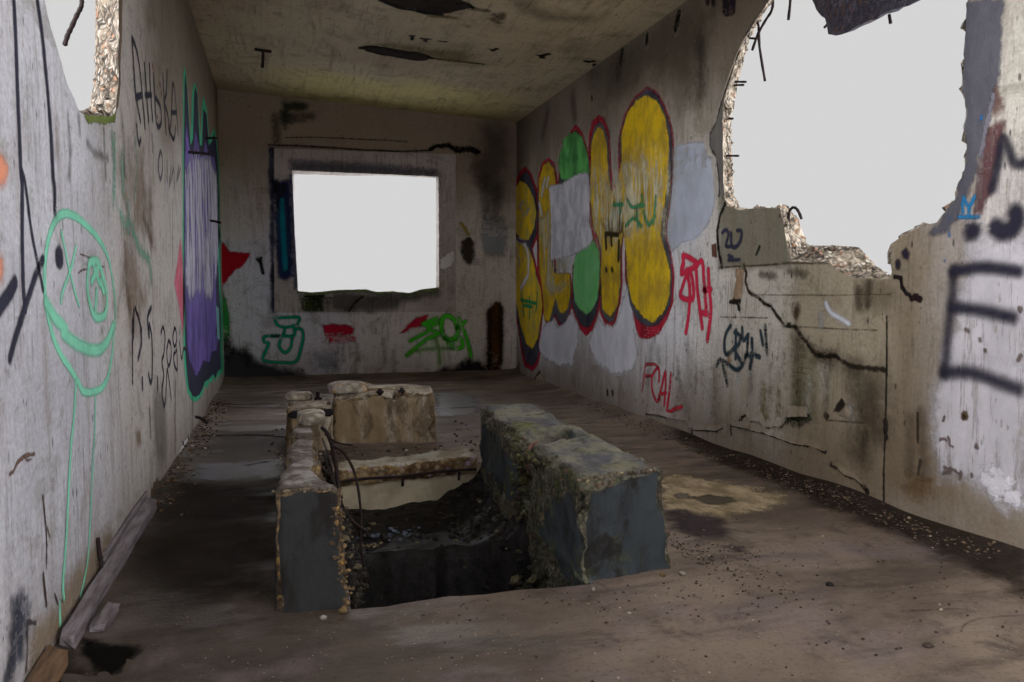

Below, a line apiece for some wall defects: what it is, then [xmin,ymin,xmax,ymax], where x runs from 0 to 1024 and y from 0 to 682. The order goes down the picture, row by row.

spalling [85,0,122,125]
spalling [706,0,736,17]
peeling [704,12,761,311]
spalling [930,0,1005,235]
crack [719,262,923,502]